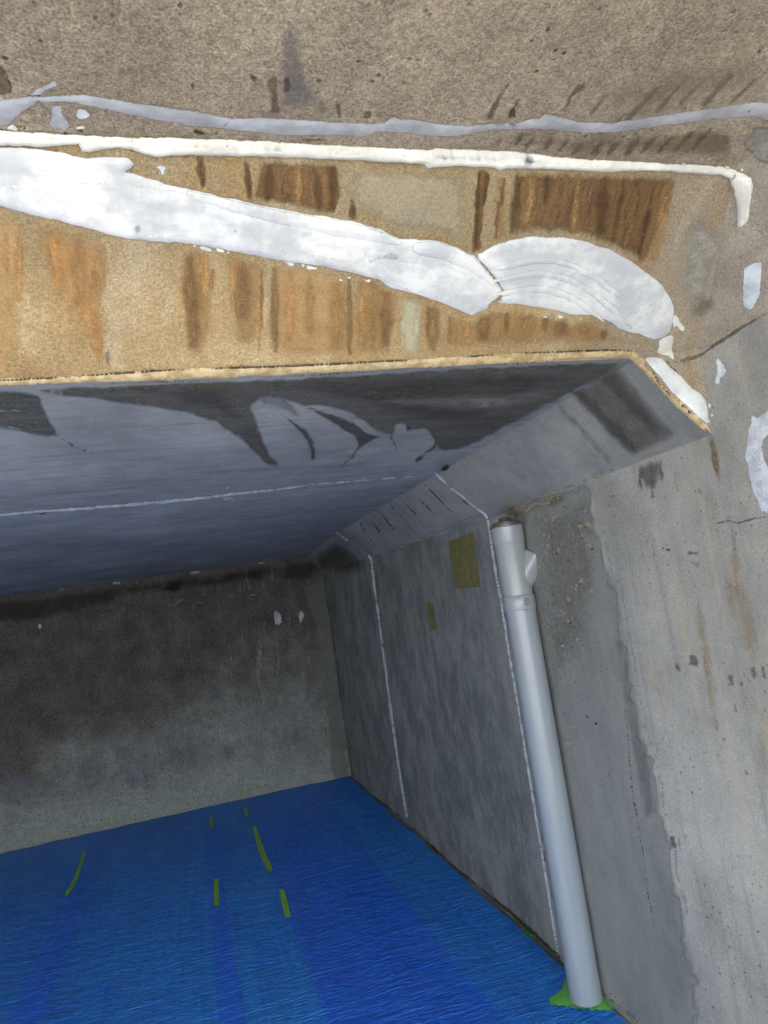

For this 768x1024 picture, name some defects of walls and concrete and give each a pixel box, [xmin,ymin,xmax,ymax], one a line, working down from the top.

corrosion [244,163,338,211]
damp [356,174,462,233]
corrosion [473,171,672,259]
damp [545,132,728,155]
corrosion [184,256,214,350]
corrosion [230,263,395,354]
damp [401,300,419,352]
crack [653,318,756,414]
damp [0,363,670,464]